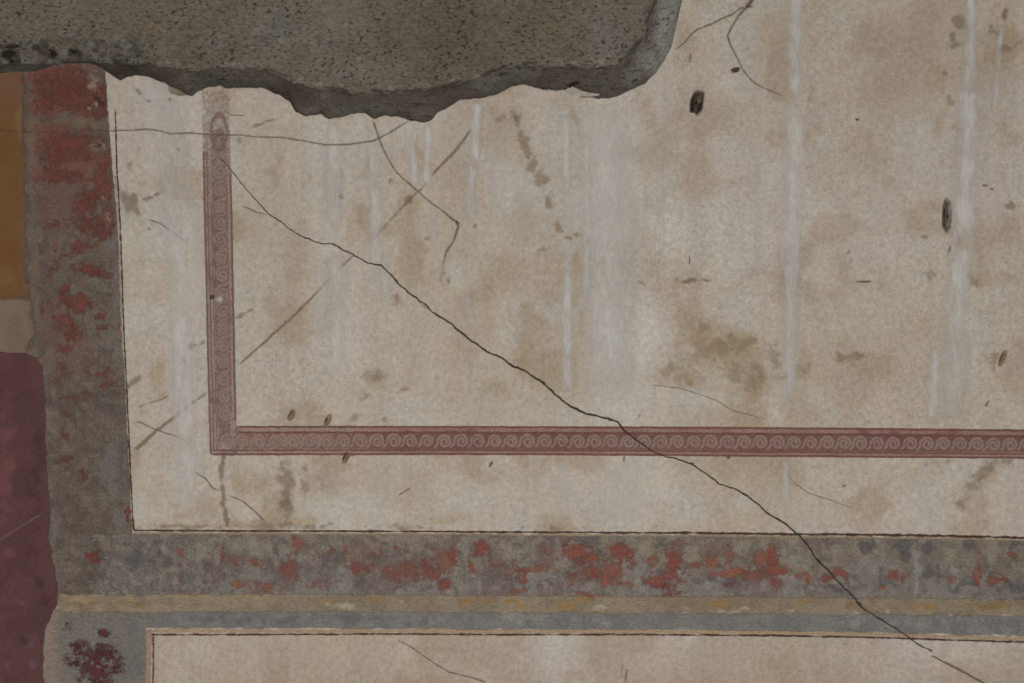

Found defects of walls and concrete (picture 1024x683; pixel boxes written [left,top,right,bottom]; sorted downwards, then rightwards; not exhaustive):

peeling [41,285,120,391]
crack [196,473,263,520]
spalling [0,0,682,279]
water stain [466,103,481,232]
water stain [562,115,630,389]
crack [220,159,984,683]
water stain [781,109,804,391]
water stain [788,0,802,93]
water stain [929,0,977,417]